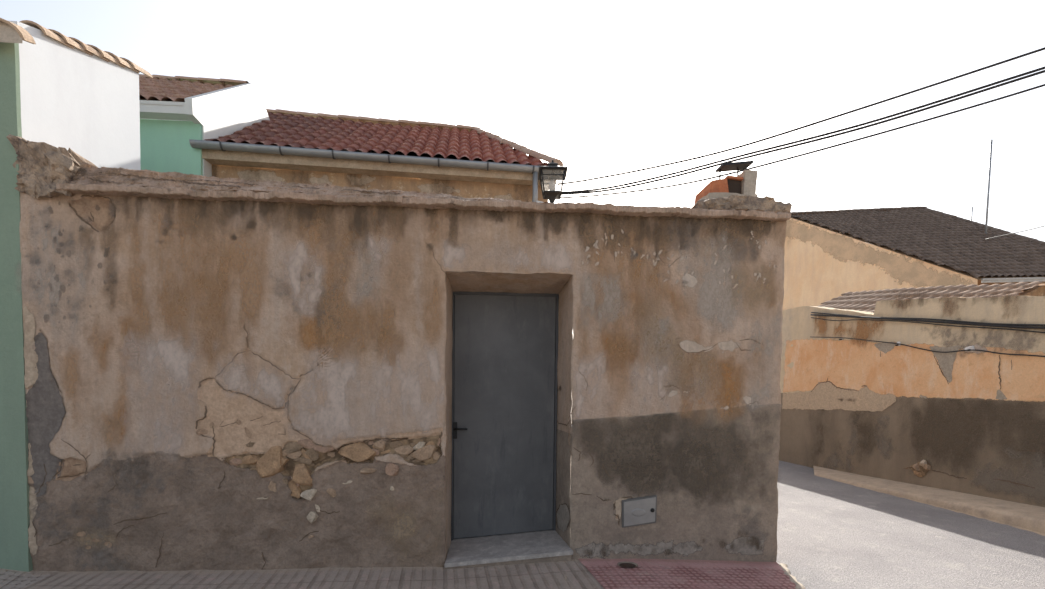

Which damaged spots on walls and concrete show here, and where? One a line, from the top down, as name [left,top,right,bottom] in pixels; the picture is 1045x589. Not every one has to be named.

peeling [582,229,698,288]
damp [522,212,766,326]
peeling [23,306,66,556]
damp [126,338,192,388]
crack [216,325,320,407]
damp [146,197,443,438]
flaking render [195,378,443,539]
damp [575,356,748,498]
peeling [675,338,762,354]
peeling [782,379,896,412]
peeling [930,345,961,384]
damp [912,400,1045,467]